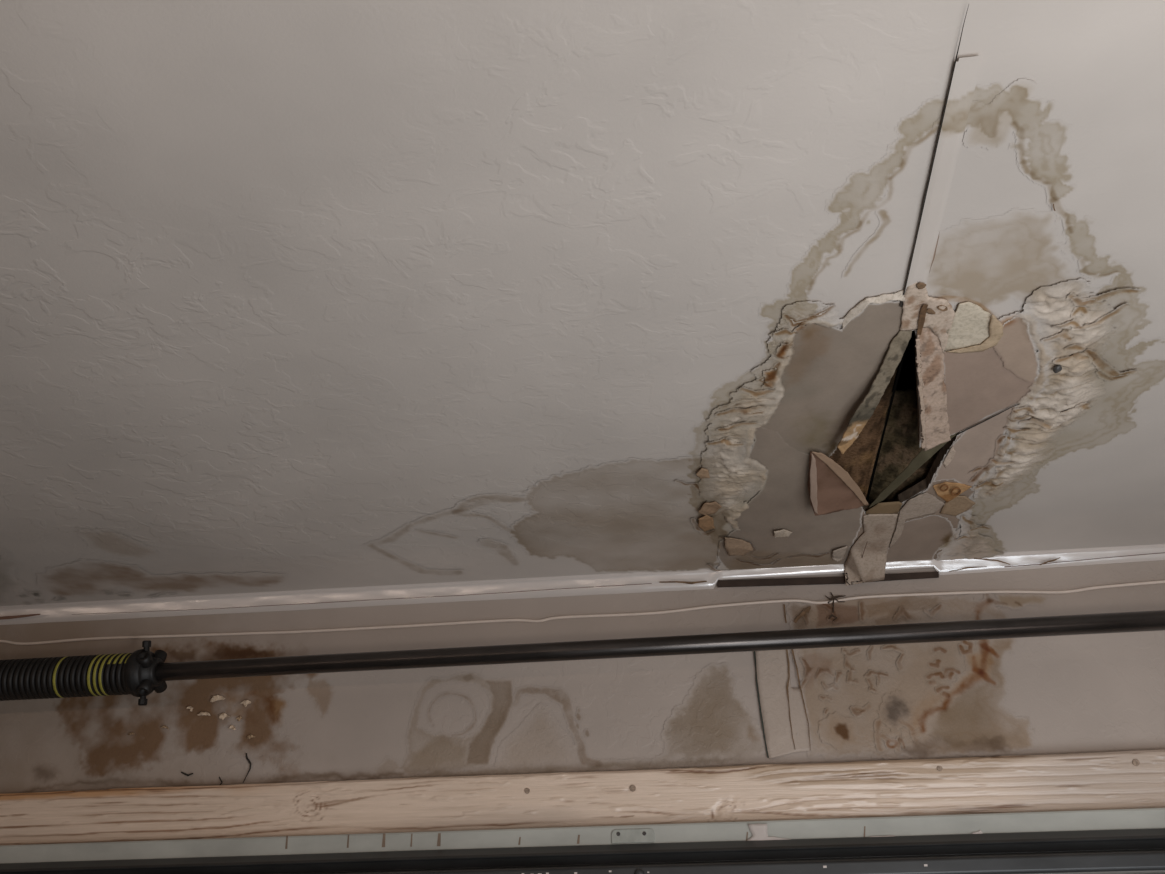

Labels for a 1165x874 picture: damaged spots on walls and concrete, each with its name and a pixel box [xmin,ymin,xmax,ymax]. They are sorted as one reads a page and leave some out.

water stain [363,95,947,577]
water stain [917,78,1165,553]
peeling [717,290,905,570]
peeling [886,301,1040,562]
water stain [0,527,288,605]
water stain [150,635,316,663]
water stain [12,662,766,793]
water stain [789,638,1036,761]
water stain [785,590,1049,630]
corrosion [916,639,1001,735]